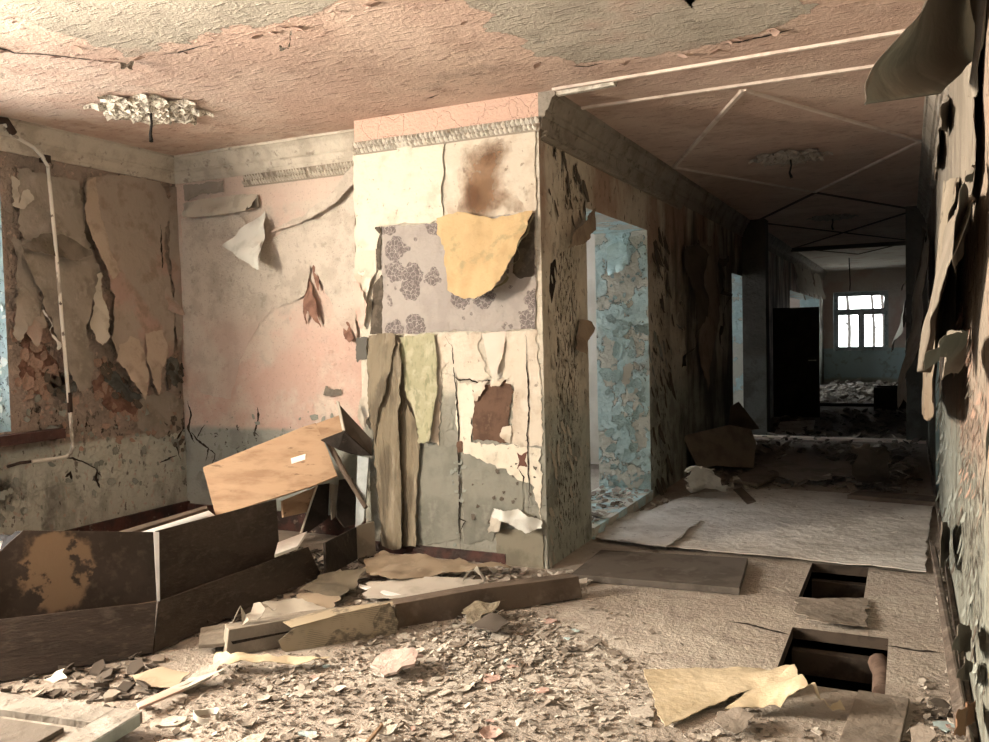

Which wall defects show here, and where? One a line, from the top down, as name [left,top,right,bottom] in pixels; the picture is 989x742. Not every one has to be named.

crack [0,48,123,64]
peeling [0,0,341,70]
peeling [464,0,819,69]
peeling [934,94,950,181]
peeling [11,175,34,209]
peeling [182,166,354,270]
peeling [0,292,187,503]
crack [160,391,215,463]
peeling [482,331,506,381]
peeling [548,146,676,569]
peeling [417,445,537,545]
peeling [935,300,986,695]